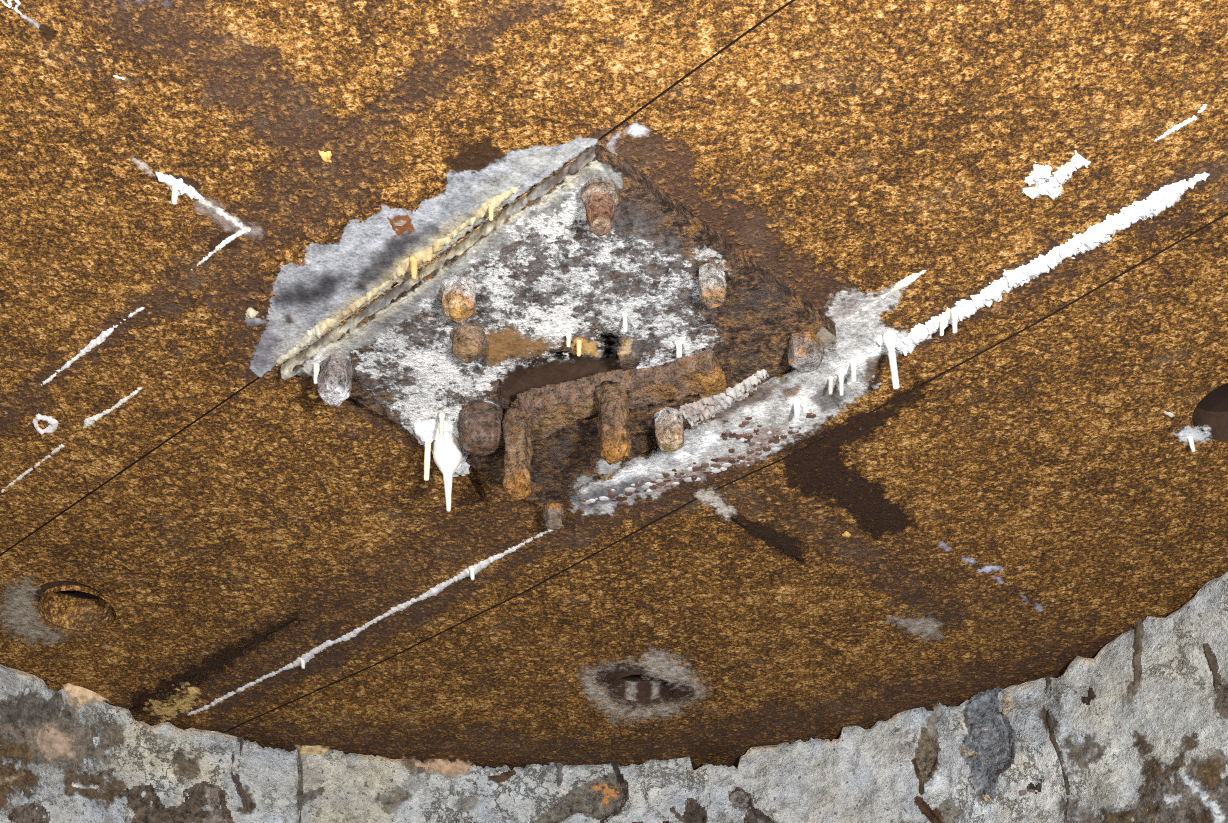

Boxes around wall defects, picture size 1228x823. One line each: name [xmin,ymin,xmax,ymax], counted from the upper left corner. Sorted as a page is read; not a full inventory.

water stain [0,0,40,28]
water stain [132,158,263,270]
peeling [244,137,598,377]
water stain [1022,150,1091,199]
water stain [41,307,144,385]
rust [481,325,600,368]
rust [511,339,727,442]
peeling [816,326,837,349]
water stain [568,172,1210,563]
water stain [132,612,307,713]
water stain [187,529,554,716]
water stain [626,679,659,701]